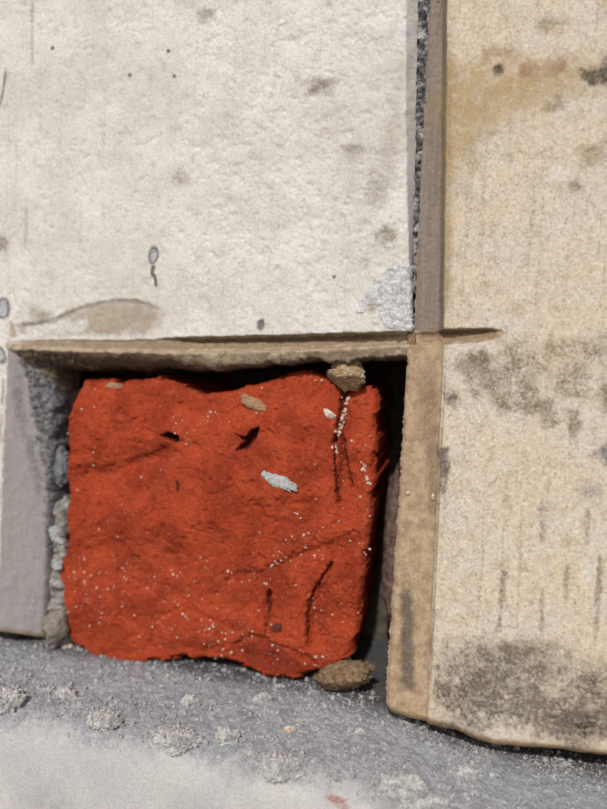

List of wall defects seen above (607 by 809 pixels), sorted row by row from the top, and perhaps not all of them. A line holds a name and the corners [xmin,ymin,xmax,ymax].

water stain [571,66,607,84]
water stain [460,345,554,424]
spalling [241,428,259,449]
peeling [261,471,298,492]